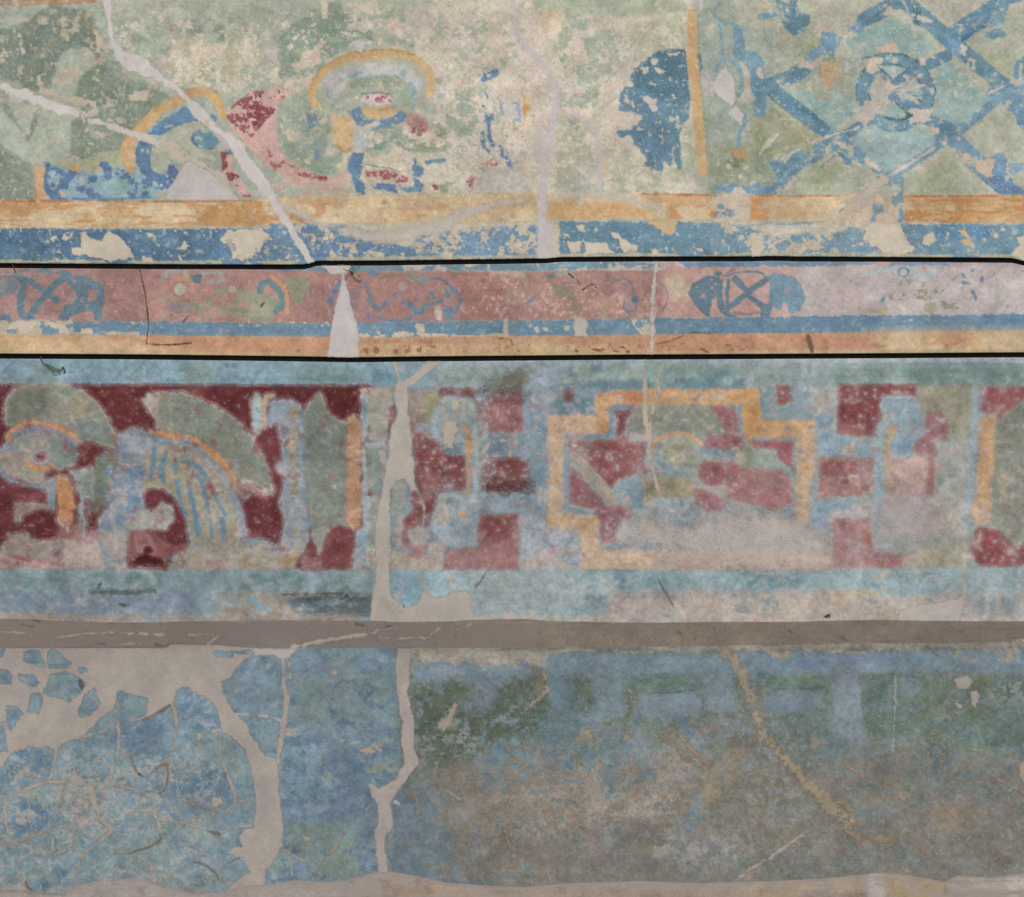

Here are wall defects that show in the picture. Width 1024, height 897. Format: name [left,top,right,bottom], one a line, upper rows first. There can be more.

crack [0,74,166,152]
crack [93,0,671,291]
flaking render [699,66,744,125]
peeling [49,230,153,263]
peeling [220,227,270,260]
peeling [563,224,659,257]
peeling [750,232,765,257]
peeling [863,222,1024,261]
crack [139,269,192,346]
crack [235,361,486,880]
crack [0,701,252,891]
flaking render [0,643,297,891]